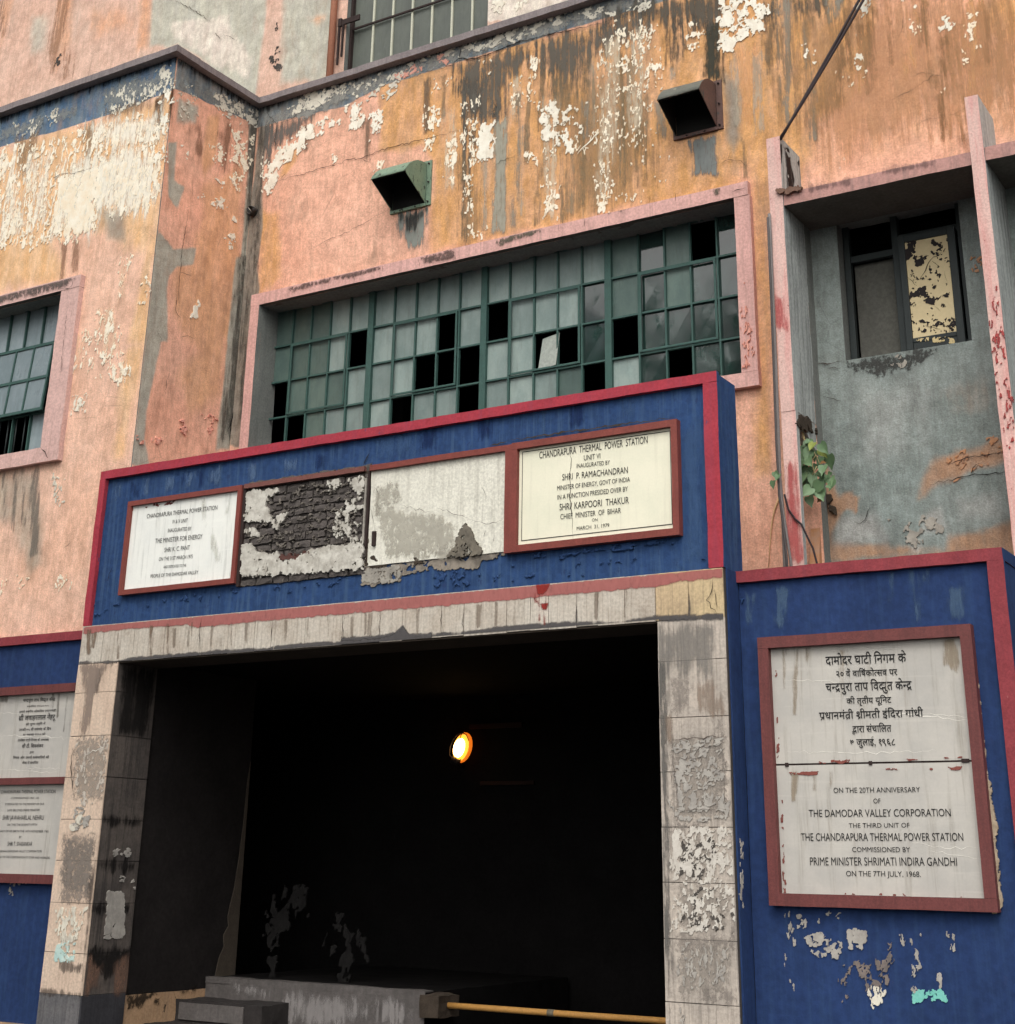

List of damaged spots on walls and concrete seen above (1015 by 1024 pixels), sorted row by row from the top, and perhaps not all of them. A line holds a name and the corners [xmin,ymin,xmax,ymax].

peeling [685,21,705,52]
peeling [715,0,771,53]
peeling [0,0,670,253]
damp [423,0,739,246]
peeling [73,309,131,387]
peeling [946,286,1014,482]
flaking render [279,550,309,561]
flaking render [360,523,505,587]
spalling [679,837,744,932]
peeling [54,941,76,963]
peeling [912,989,948,1004]